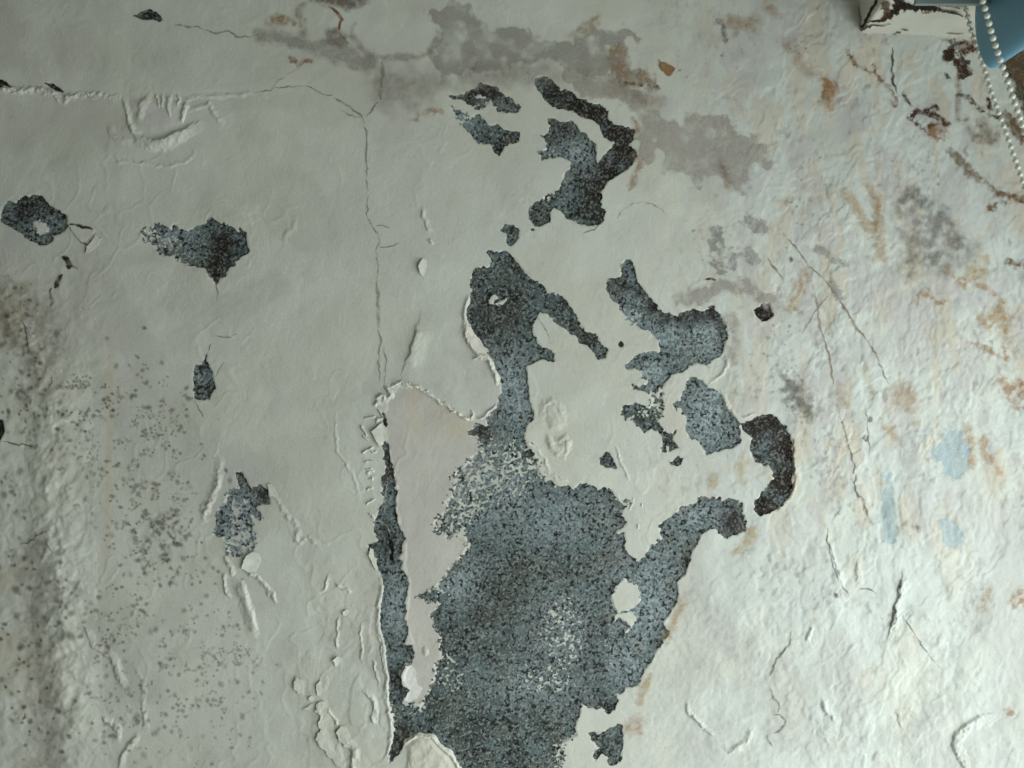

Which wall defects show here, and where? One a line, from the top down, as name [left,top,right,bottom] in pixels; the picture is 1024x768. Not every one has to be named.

crack [332,8,344,39]
water stain [317,0,362,9]
rust [607,43,675,88]
water stain [429,4,771,195]
spalling [1,195,101,254]
spalling [138,217,250,284]
crack [256,71,396,274]
rust [987,191,1024,211]
crack [789,240,889,384]
crack [378,331,387,378]
spalling [332,76,798,768]
spalling [197,454,322,642]